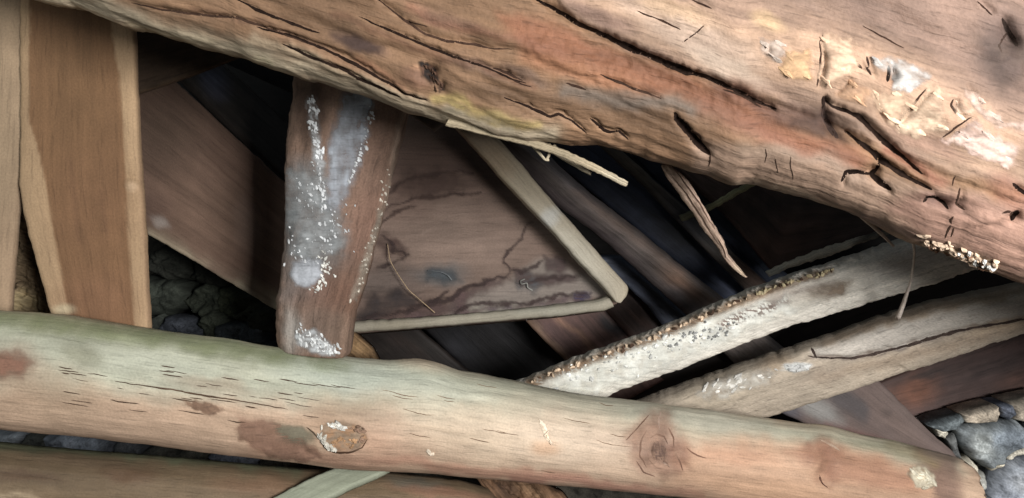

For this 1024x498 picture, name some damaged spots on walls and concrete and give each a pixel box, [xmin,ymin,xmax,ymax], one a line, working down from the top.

crack [133,0,426,100]
crack [359,0,628,139]
crack [566,74,711,165]
crack [817,35,965,238]
peeling [760,34,1024,169]
leakage [283,90,375,293]
crack [809,318,1024,360]
leakage [277,426,312,442]
peeling [317,421,367,452]